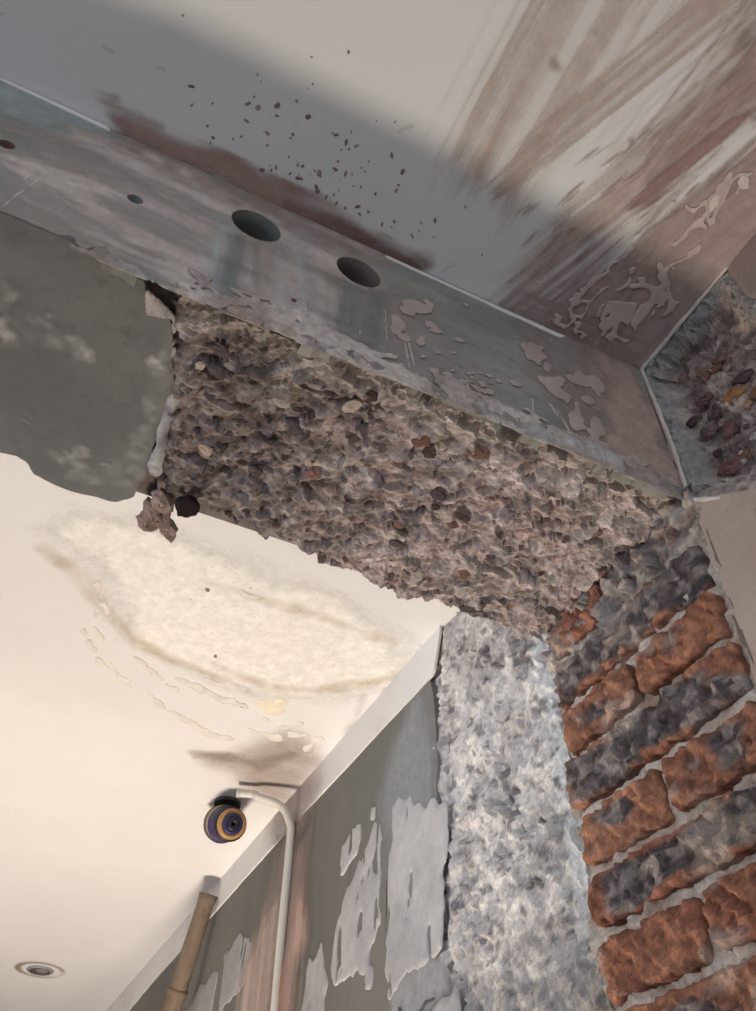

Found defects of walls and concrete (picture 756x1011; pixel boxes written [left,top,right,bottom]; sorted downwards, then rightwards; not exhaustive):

corrosion [104,95,425,269]
spalling [46,171,756,1011]